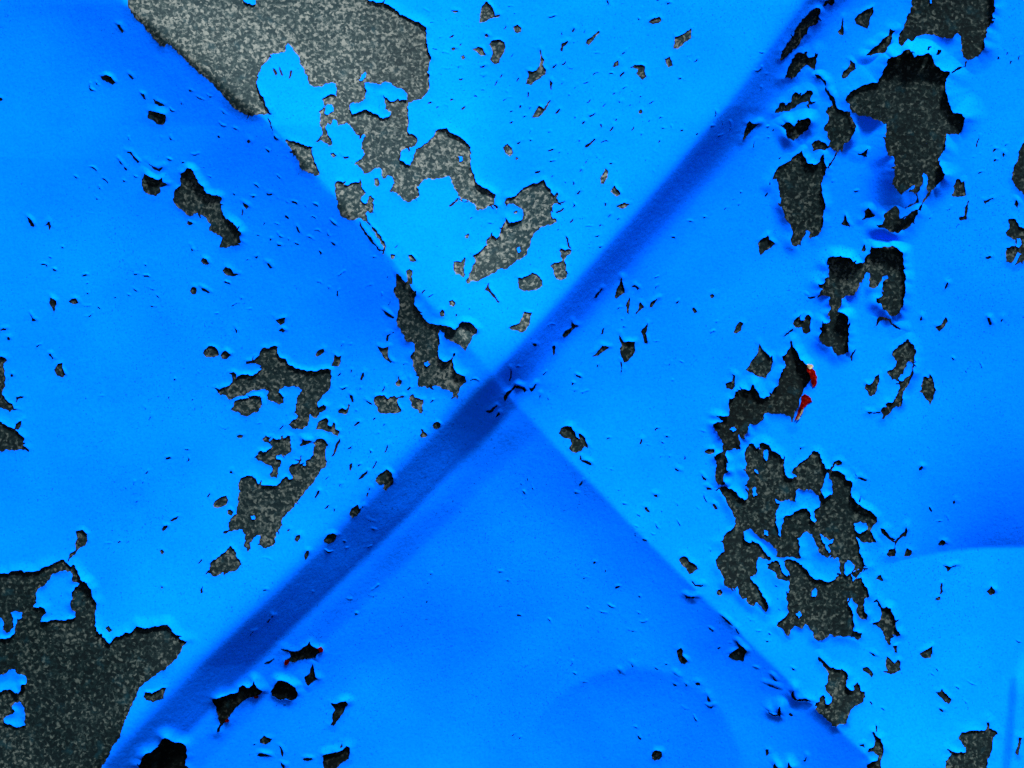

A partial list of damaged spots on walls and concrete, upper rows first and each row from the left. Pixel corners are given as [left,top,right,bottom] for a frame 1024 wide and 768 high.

peeling [128,0,565,284]
peeling [769,0,996,247]
peeling [1006,143,1024,265]
peeling [0,356,29,453]
peeling [203,346,231,359]
peeling [209,346,350,577]
peeling [374,254,477,414]
peeling [705,341,901,727]
peeling [793,244,906,355]
peeling [0,530,187,768]
peeling [212,641,324,733]
peeling [945,722,998,768]